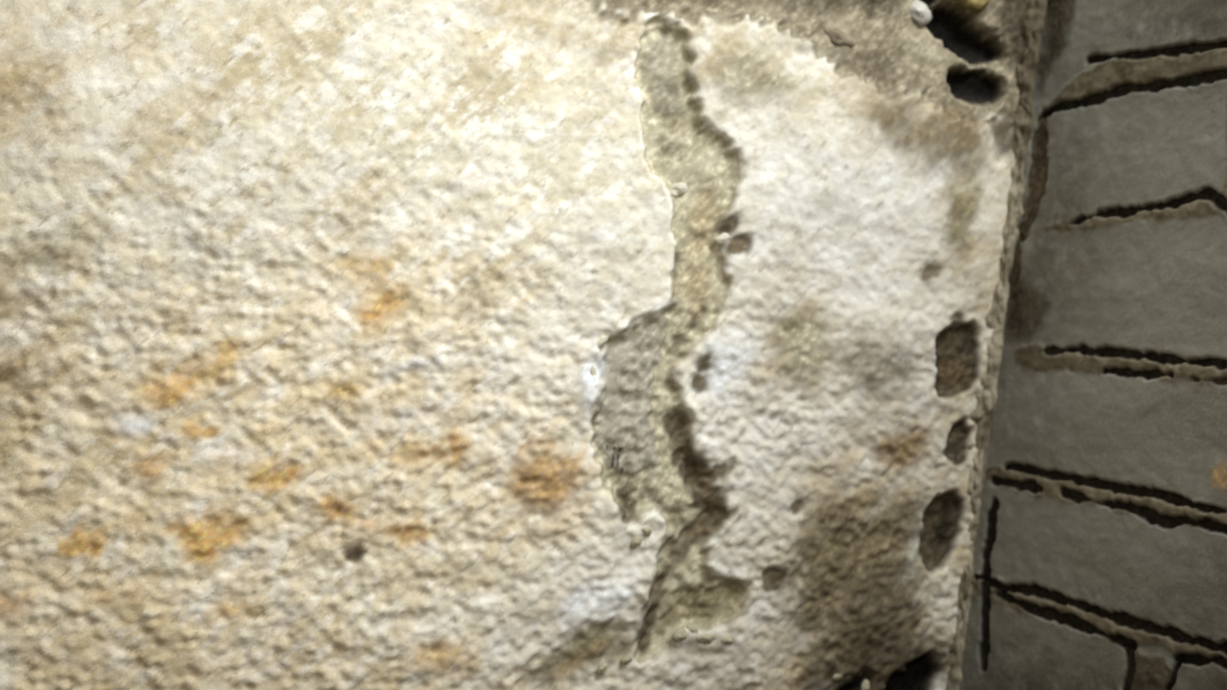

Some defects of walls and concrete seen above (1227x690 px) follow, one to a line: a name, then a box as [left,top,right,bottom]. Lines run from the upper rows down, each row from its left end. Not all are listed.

leakage [718,48,796,94]
leakage [879,101,1023,168]
crack [1010,41,1227,284]
flaking render [523,0,1026,684]
crack [1044,345,1227,384]
corrosion [251,469,295,488]
corrosion [513,443,577,502]
corrosion [60,531,103,555]
corrosion [180,520,242,558]
leakage [783,501,938,690]
crack [975,463,1227,690]